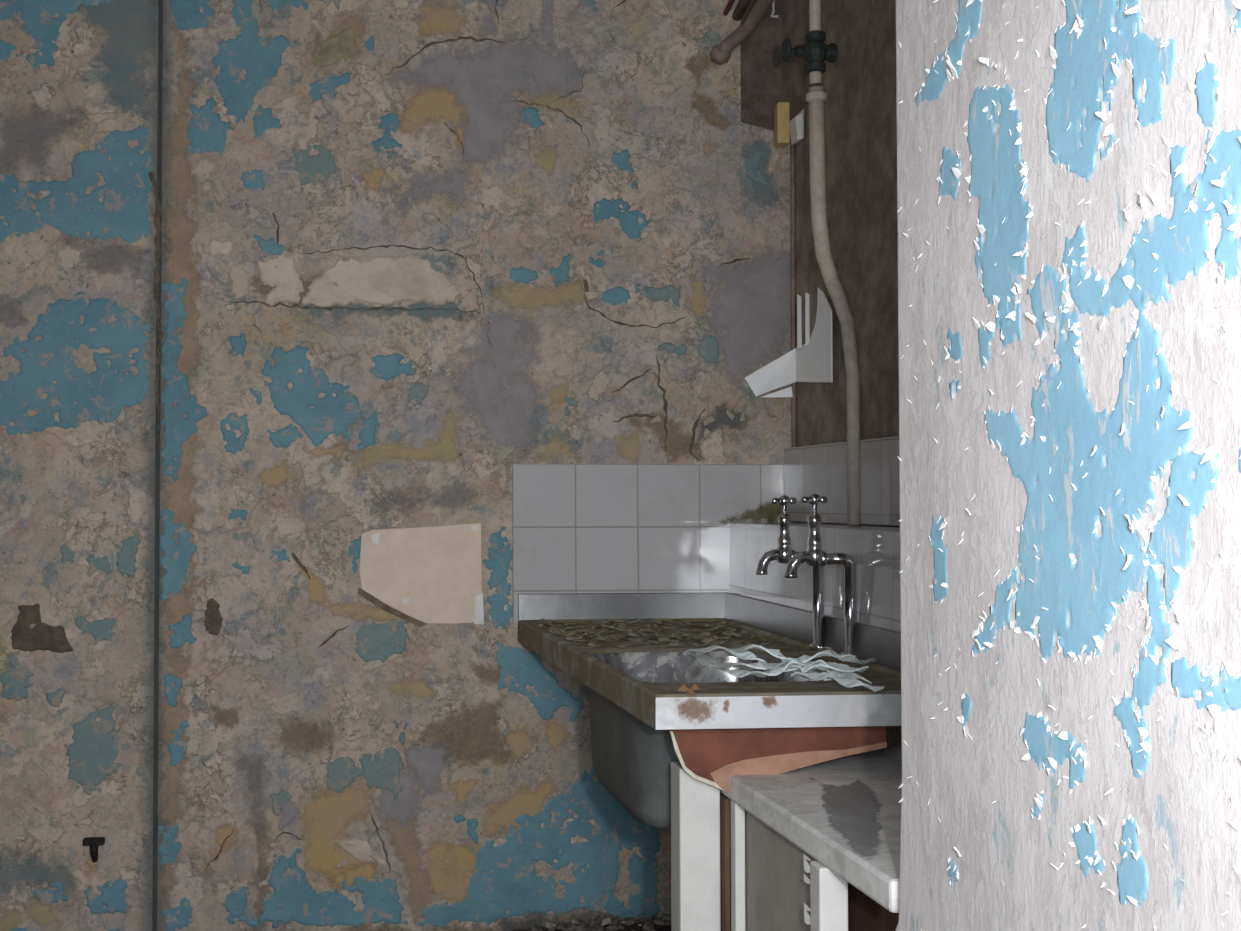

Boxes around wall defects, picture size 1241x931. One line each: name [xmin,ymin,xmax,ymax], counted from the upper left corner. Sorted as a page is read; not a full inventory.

peeling [186,0,289,155]
crack [385,0,527,75]
peeling [0,125,153,245]
crack [230,212,493,348]
crack [719,257,749,265]
peeling [249,340,379,451]
crack [580,280,706,461]
peeling [899,0,1241,778]
flaking render [0,603,116,701]
peeling [1020,705,1087,794]
peeling [224,767,663,930]
peeling [1050,814,1149,906]